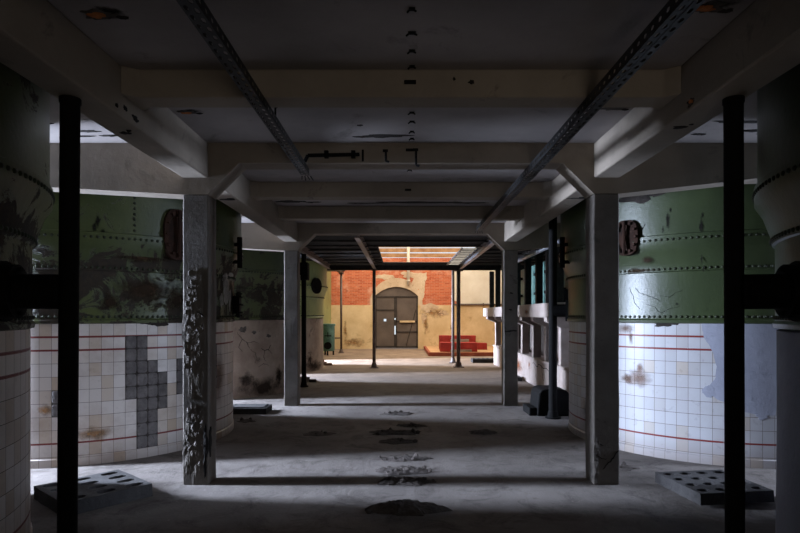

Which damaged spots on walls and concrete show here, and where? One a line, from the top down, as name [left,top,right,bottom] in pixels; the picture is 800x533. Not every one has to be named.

peeling [376,271,457,324]
water stain [242,369,282,395]
peeling [702,324,724,402]
peeling [745,324,778,420]